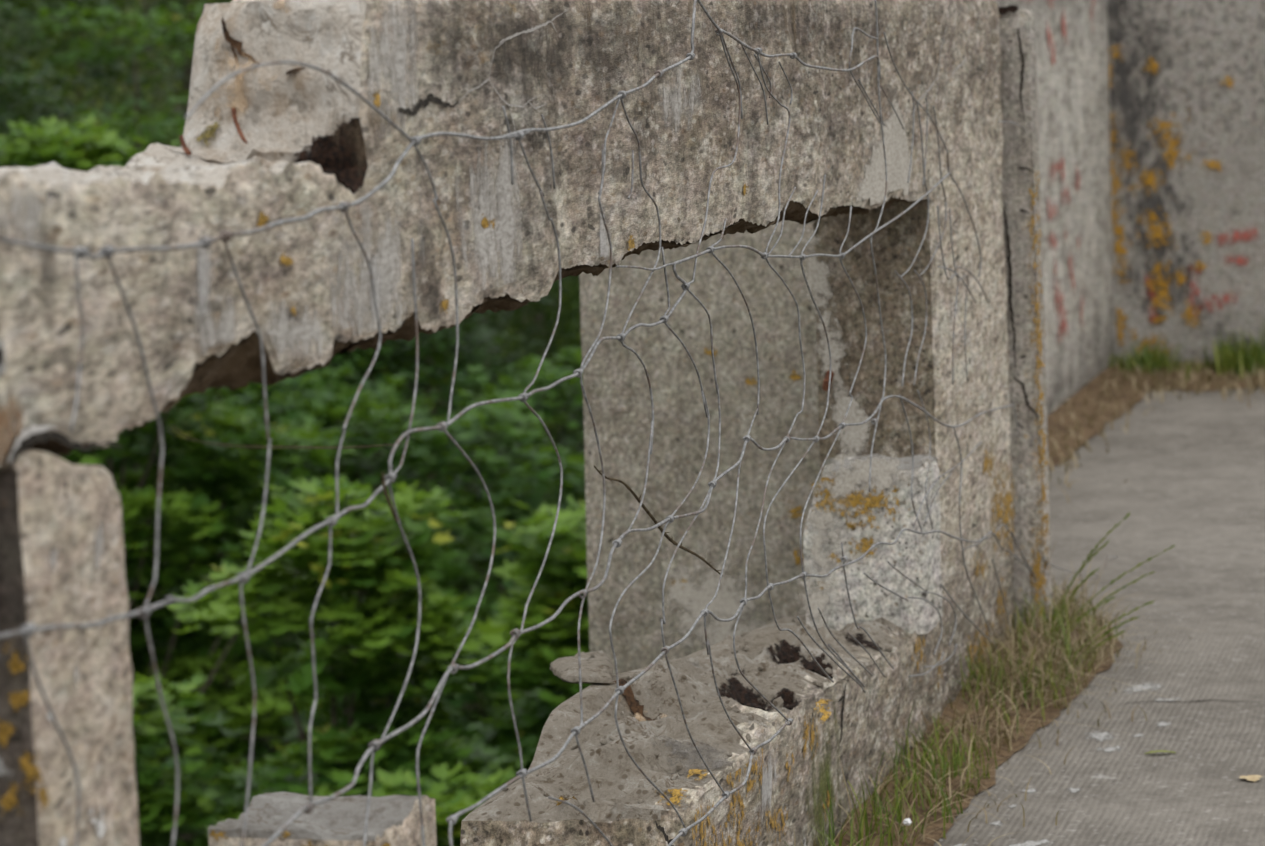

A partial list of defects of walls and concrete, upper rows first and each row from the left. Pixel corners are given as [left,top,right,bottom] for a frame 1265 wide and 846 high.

spalling [294,90,395,193]
crack [398,10,567,151]
peeling [440,140,529,329]
peeling [553,91,933,629]
crack [1017,28,1025,121]
crack [1003,206,1039,426]